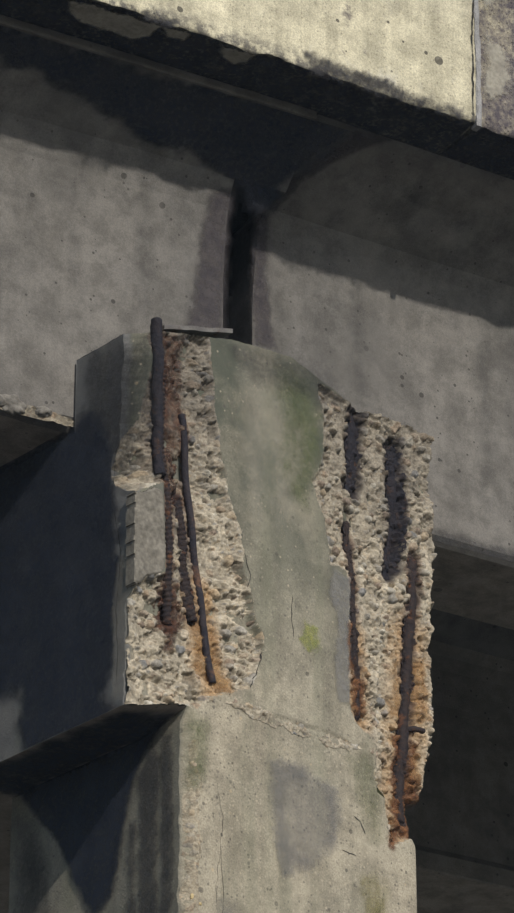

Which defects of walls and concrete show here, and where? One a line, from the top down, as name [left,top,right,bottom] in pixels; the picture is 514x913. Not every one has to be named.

damp [0,0,514,347]
rust [154,583,185,651]
spalling [111,317,264,709]
rust [348,624,367,714]
spalling [310,382,437,848]
rust [389,735,421,849]